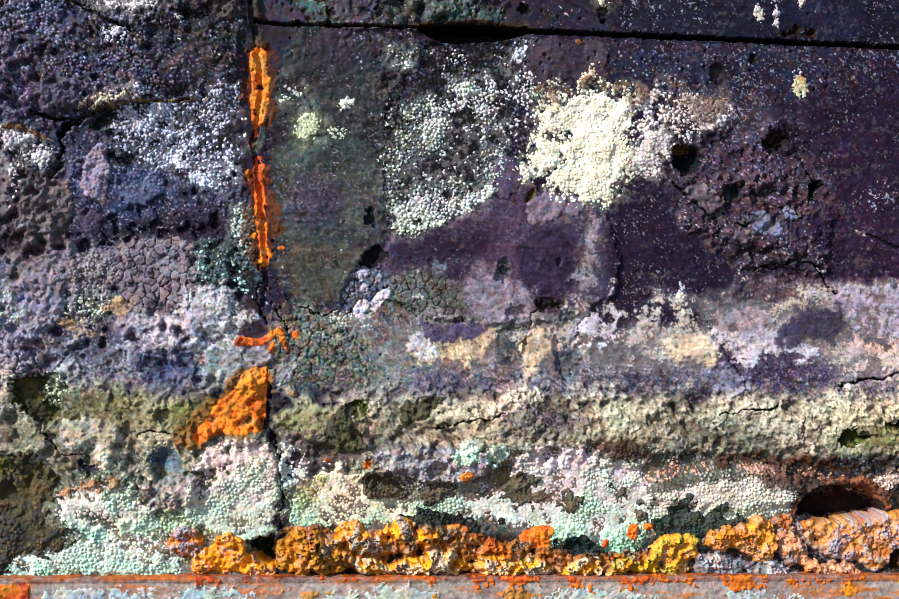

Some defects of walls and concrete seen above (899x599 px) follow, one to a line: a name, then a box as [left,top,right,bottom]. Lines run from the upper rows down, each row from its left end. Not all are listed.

corrosion [237,42,287,271]
crack [672,181,750,237]
crack [254,271,337,357]
crack [753,259,836,295]
corrosion [172,326,299,450]
crack [267,368,285,529]
crack [435,413,506,430]
corrosion [586,434,656,464]
crack [704,320,779,417]
crack [838,373,895,388]
corrosion [166,441,899,599]
corrosion [0,582,31,599]